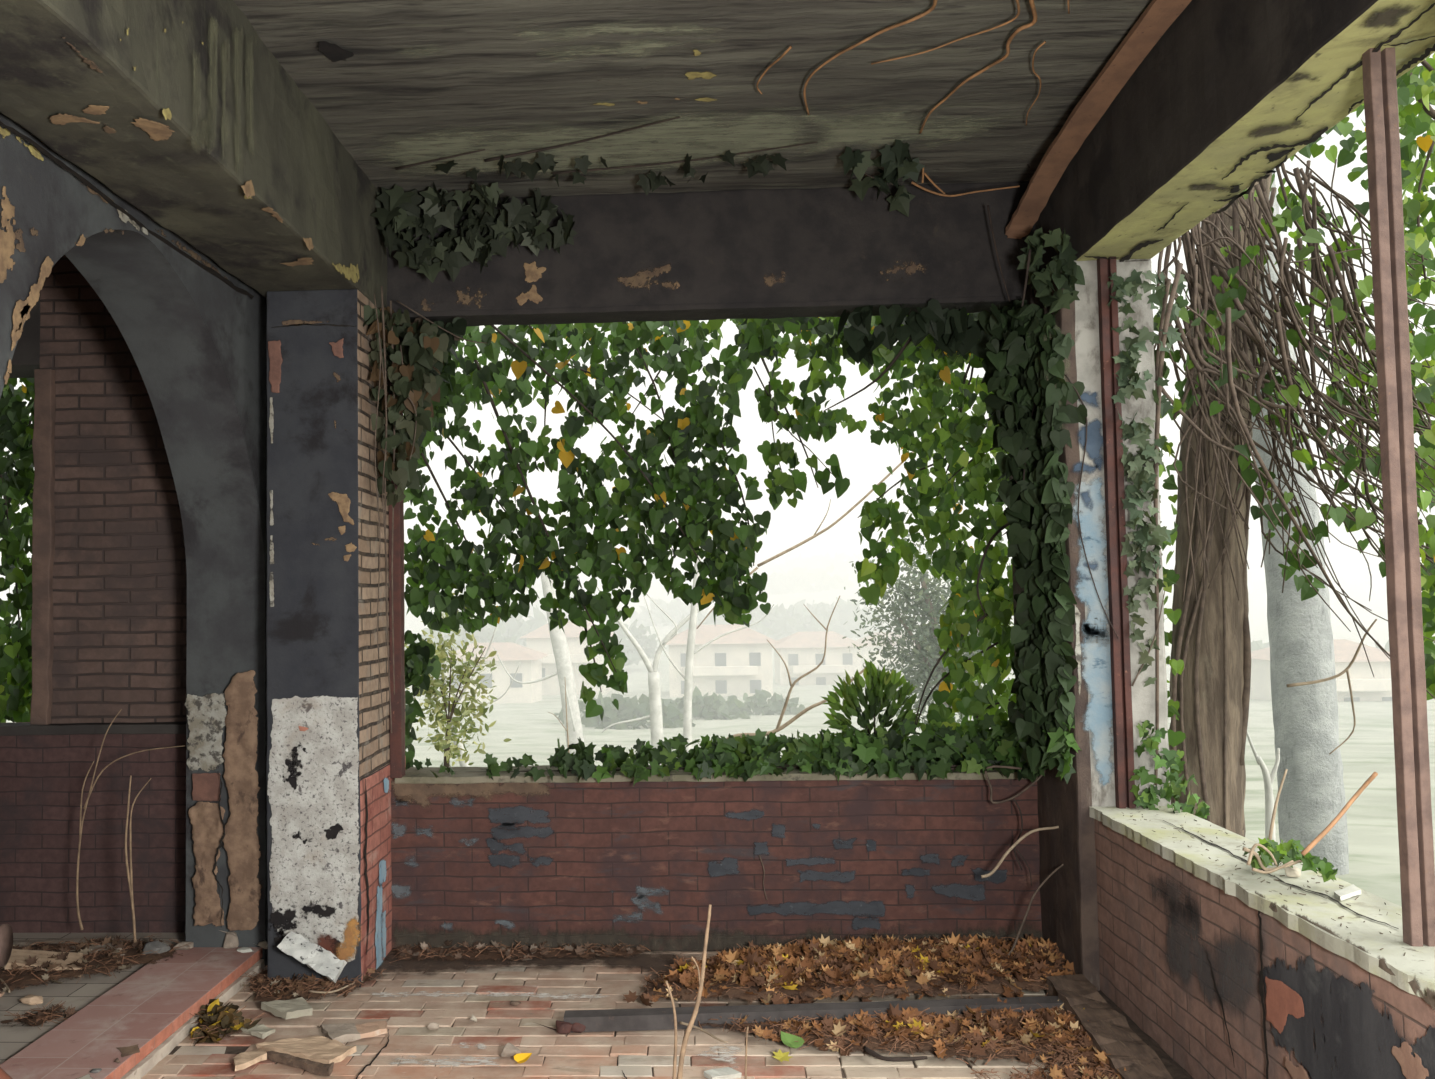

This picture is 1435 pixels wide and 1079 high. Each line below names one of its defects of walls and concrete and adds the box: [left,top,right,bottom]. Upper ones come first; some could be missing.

spalling [50,105,175,141]
crack [1085,3,1435,262]
flaking render [0,186,38,283]
flaking render [4,256,54,384]
flaking render [516,261,546,306]
flaking render [617,263,680,290]
peeling [185,670,360,962]
peeling [1228,878,1435,1079]